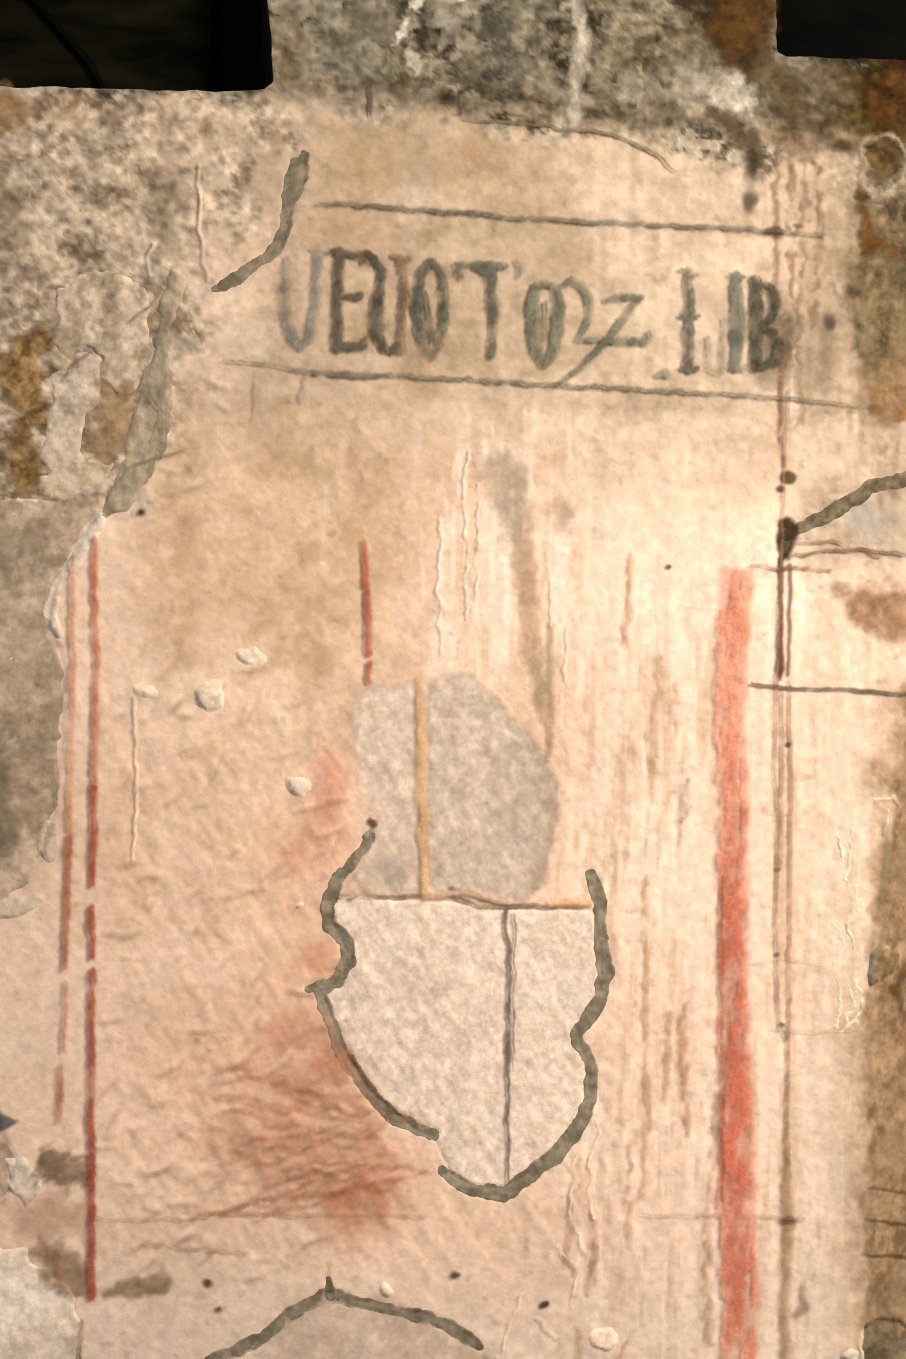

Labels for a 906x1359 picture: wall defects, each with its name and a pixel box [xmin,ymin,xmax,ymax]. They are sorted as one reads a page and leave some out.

rust [856,190,902,261]
rust [778,337,796,491]
rust [869,365,906,421]
spalling [0,270,153,919]
leakage [494,464,553,754]
rust [777,516,798,680]
leakage [836,586,906,640]
leakage [862,760,906,1335]
peeling [0,1113,45,1207]
spalling [840,1319,906,1359]